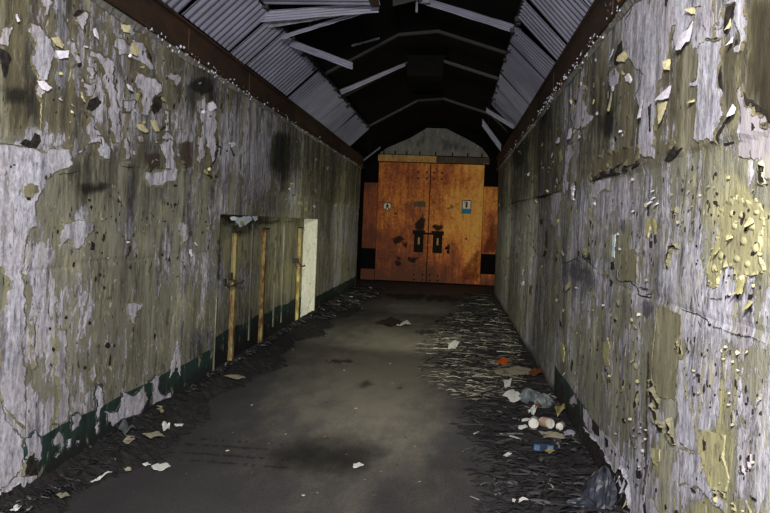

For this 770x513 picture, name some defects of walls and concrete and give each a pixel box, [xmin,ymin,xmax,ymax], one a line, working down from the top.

peeling [230,204,264,227]